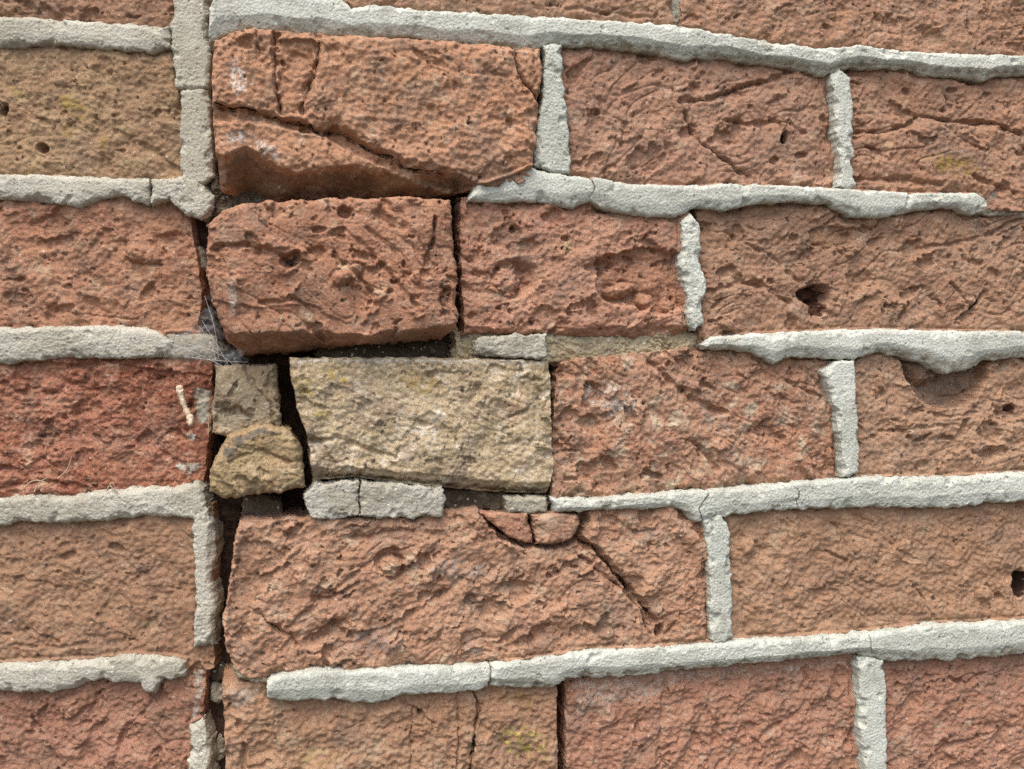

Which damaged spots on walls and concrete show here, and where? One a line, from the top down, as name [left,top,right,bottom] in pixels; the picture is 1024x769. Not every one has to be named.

crack [214,36,443,175]
crack [196,217,215,251]
crack [205,278,314,507]
crack [209,434,243,769]
crack [480,507,534,542]
crack [574,512,657,635]
crack [456,692,478,769]